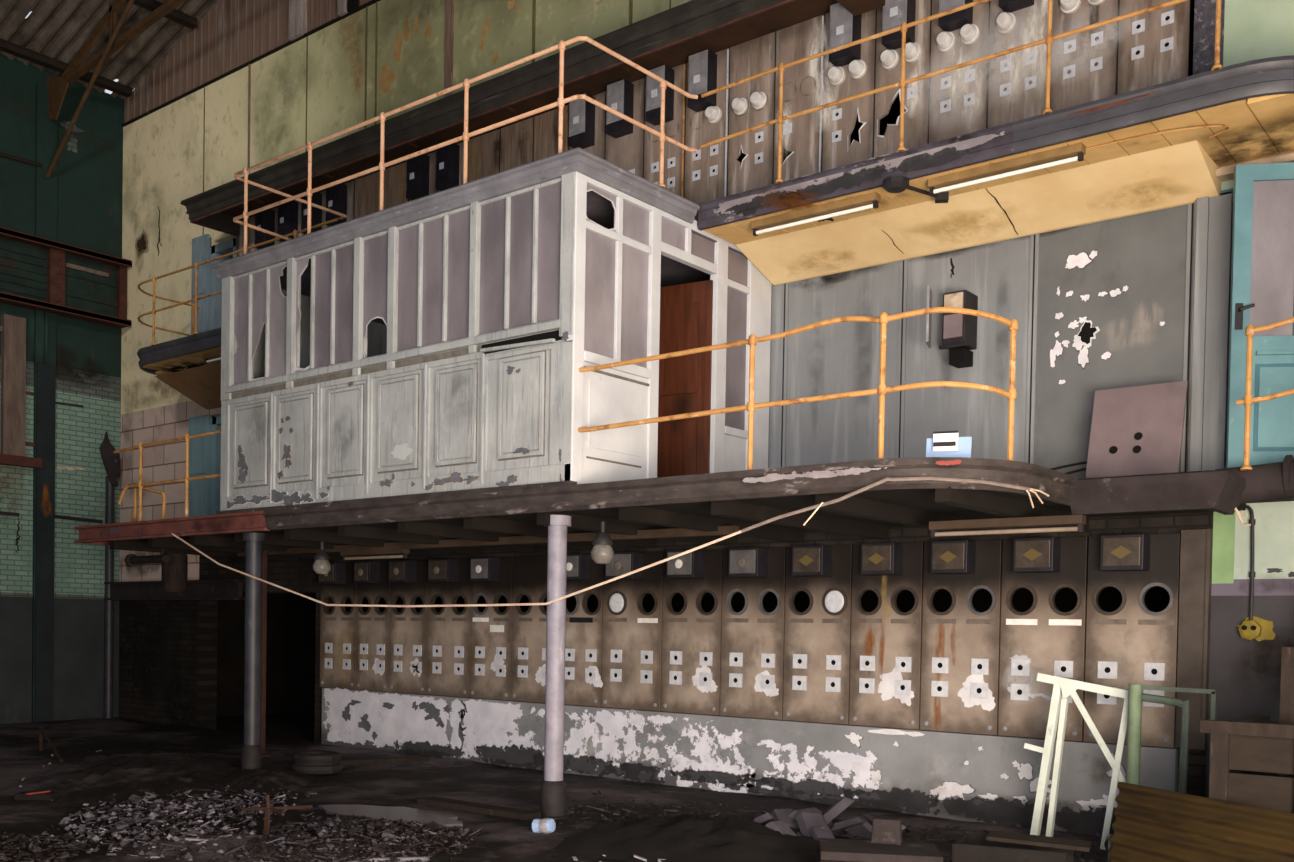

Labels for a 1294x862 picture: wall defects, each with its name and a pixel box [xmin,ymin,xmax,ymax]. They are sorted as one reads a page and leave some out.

peeling [712,131,1005,215]
crack [986,189,1018,235]
peeling [1065,250,1098,270]
peeling [1050,285,1129,385]
peeling [226,416,330,509]
peeling [380,443,413,488]
corrosion [866,633,883,666]
peeling [323,687,545,770]
spalling [563,709,1126,837]